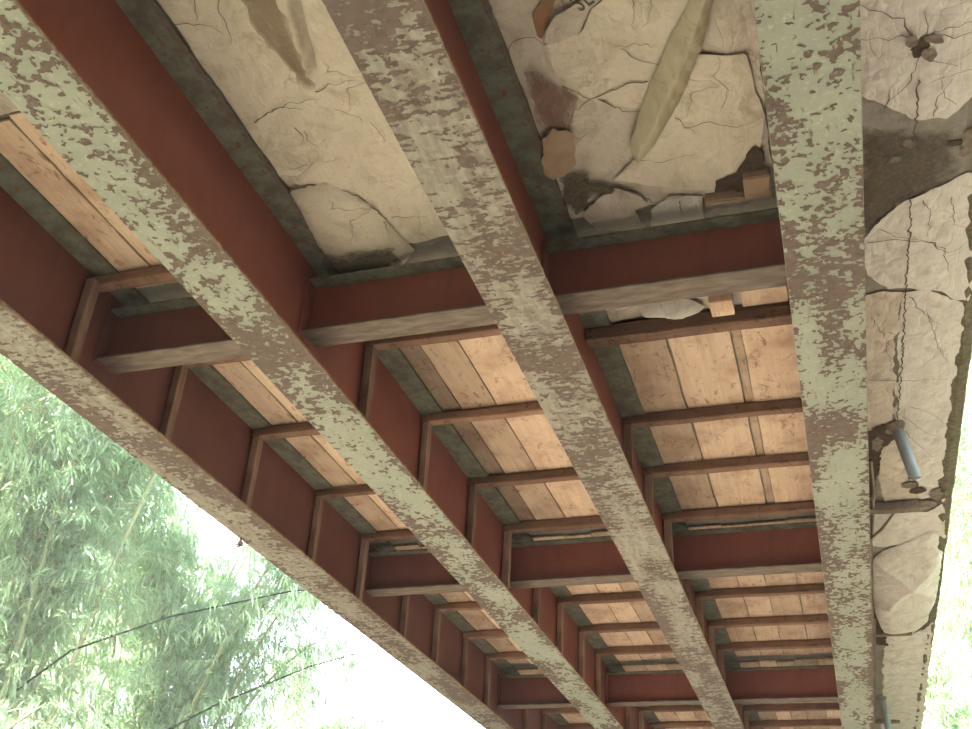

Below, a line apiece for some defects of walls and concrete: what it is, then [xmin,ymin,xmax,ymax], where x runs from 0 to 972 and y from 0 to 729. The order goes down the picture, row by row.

crack [175,0,232,41]
crack [254,80,385,189]
crack [562,0,658,139]
crack [629,81,758,163]
spalling [905,35,944,62]
crack [342,190,425,232]
crack [860,0,972,458]
peeling [0,0,623,729]
peeling [322,0,744,729]
peeling [715,0,894,729]